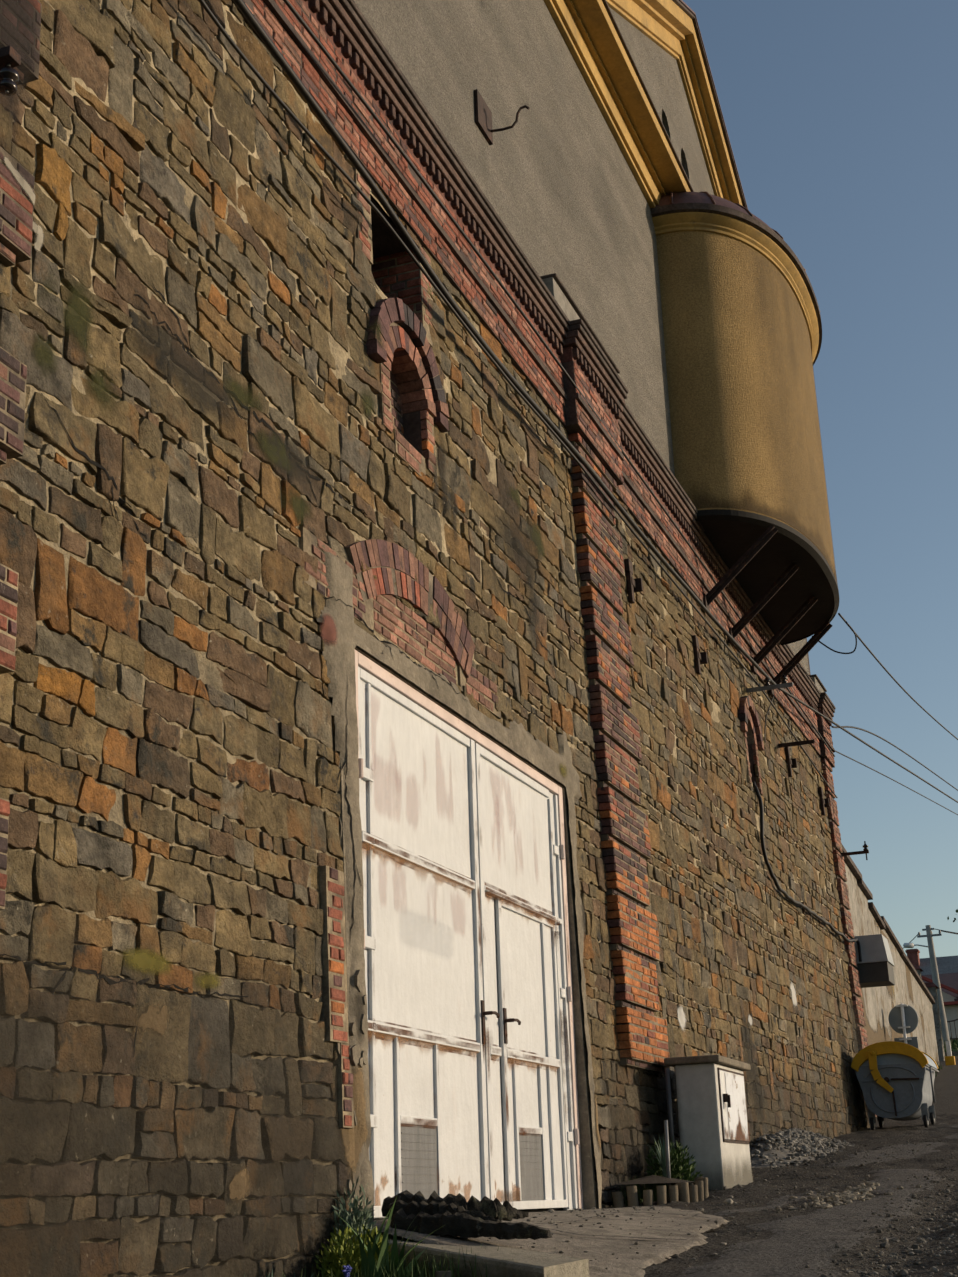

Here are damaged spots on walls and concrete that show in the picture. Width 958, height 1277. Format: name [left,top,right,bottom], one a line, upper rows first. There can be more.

crack [336,667,362,959]
corrosion [401,1118,437,1129]
corrosion [375,1172,397,1206]
corrosion [495,1183,521,1202]